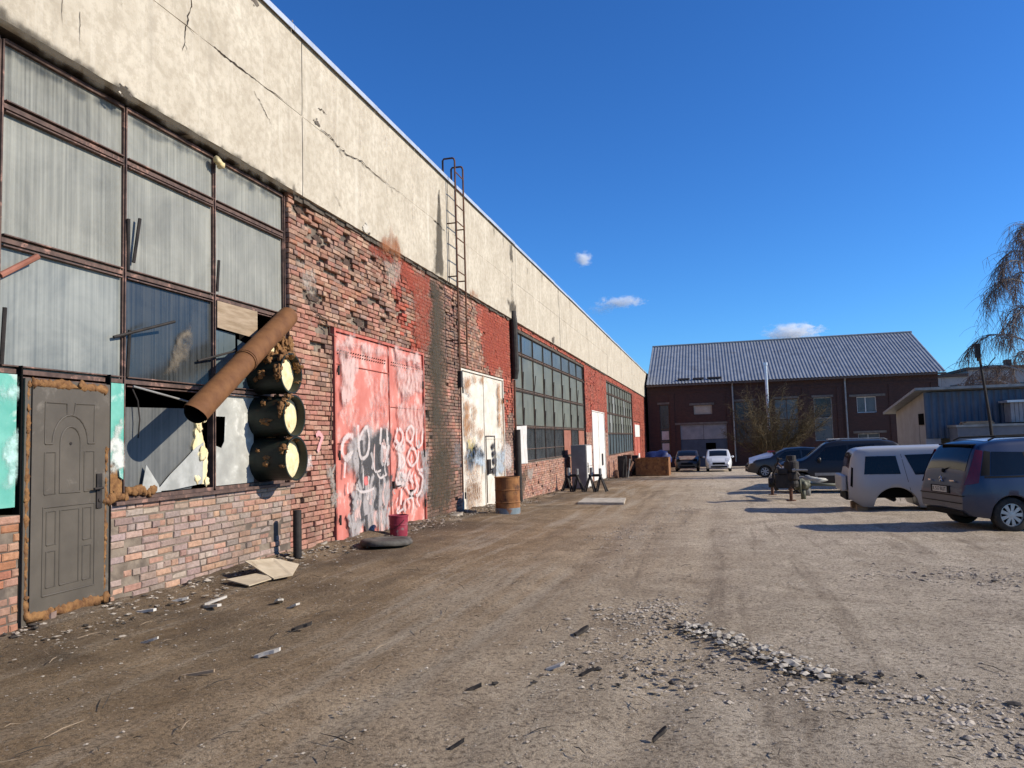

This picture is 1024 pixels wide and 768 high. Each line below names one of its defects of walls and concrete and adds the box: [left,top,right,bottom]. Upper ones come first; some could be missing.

crack [214,46,287,125]
crack [319,108,399,192]
leakage [428,190,456,512]